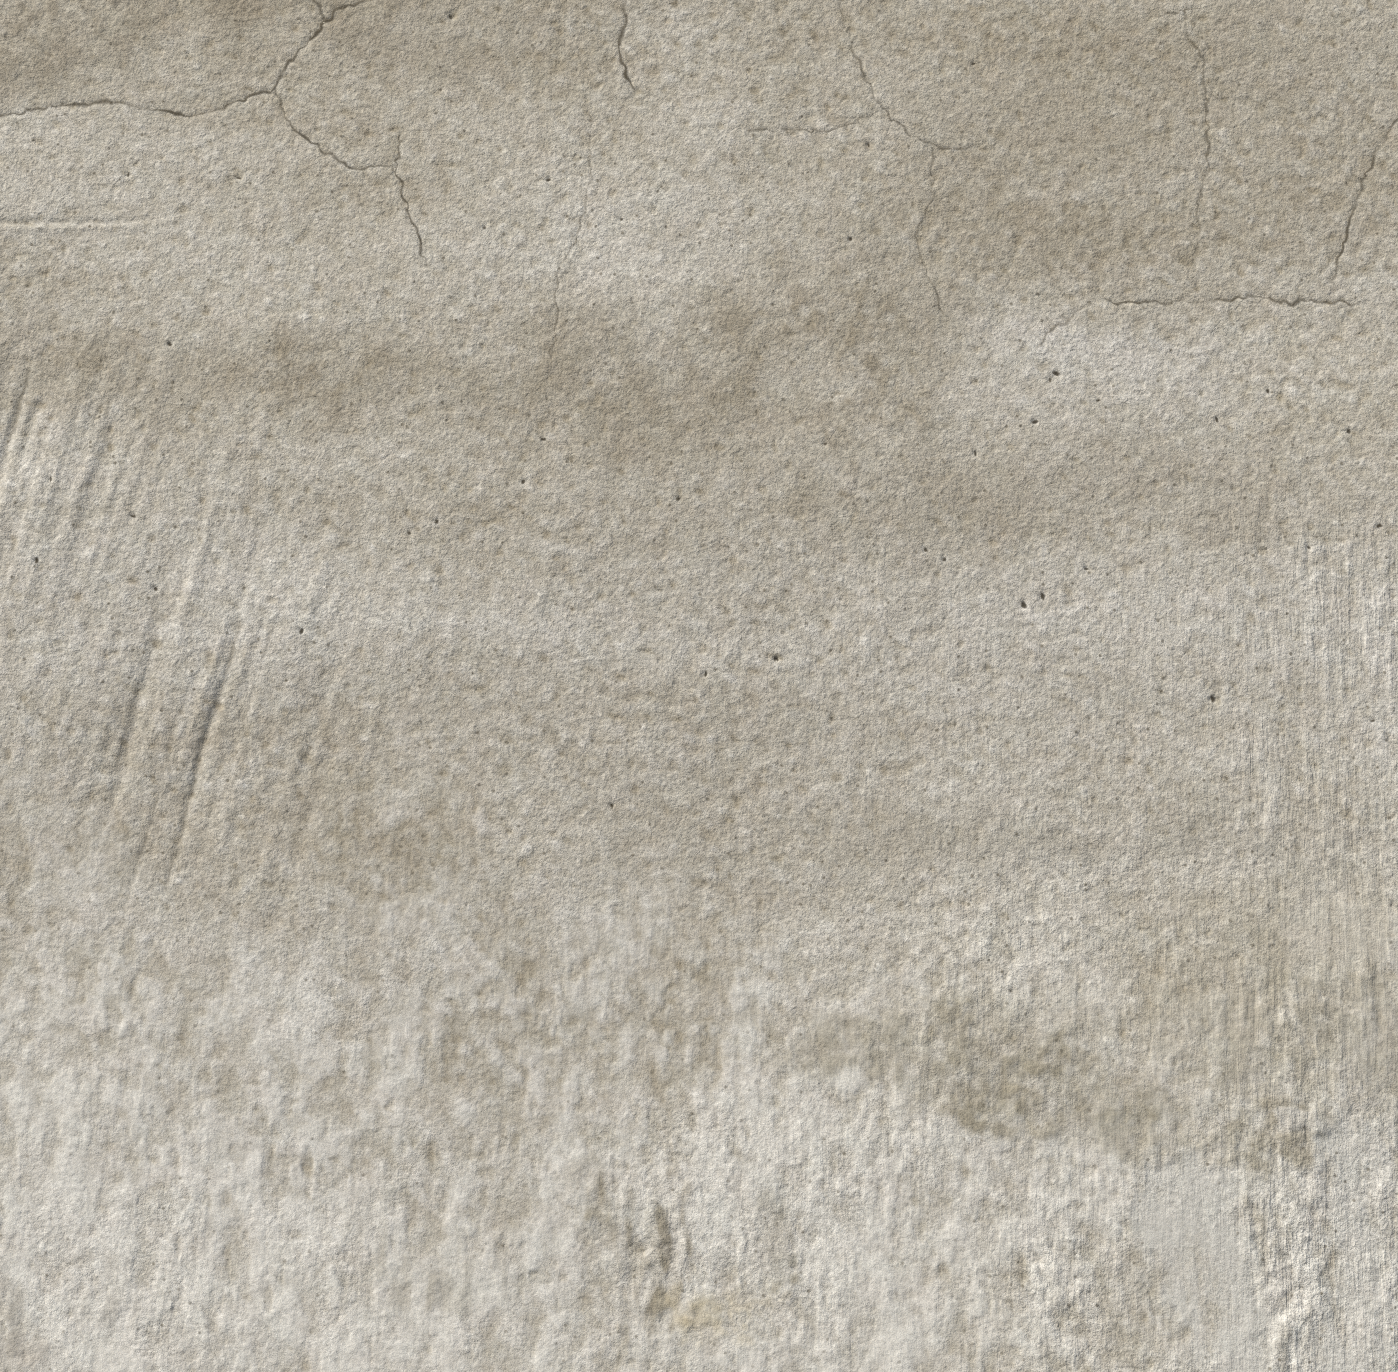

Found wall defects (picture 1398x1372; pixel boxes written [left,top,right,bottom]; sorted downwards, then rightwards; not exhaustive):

crack [157,2,359,117]
crack [618,20,631,84]
crack [296,131,422,253]
crack [1337,216,1351,258]
leakage [758,784,1398,1272]